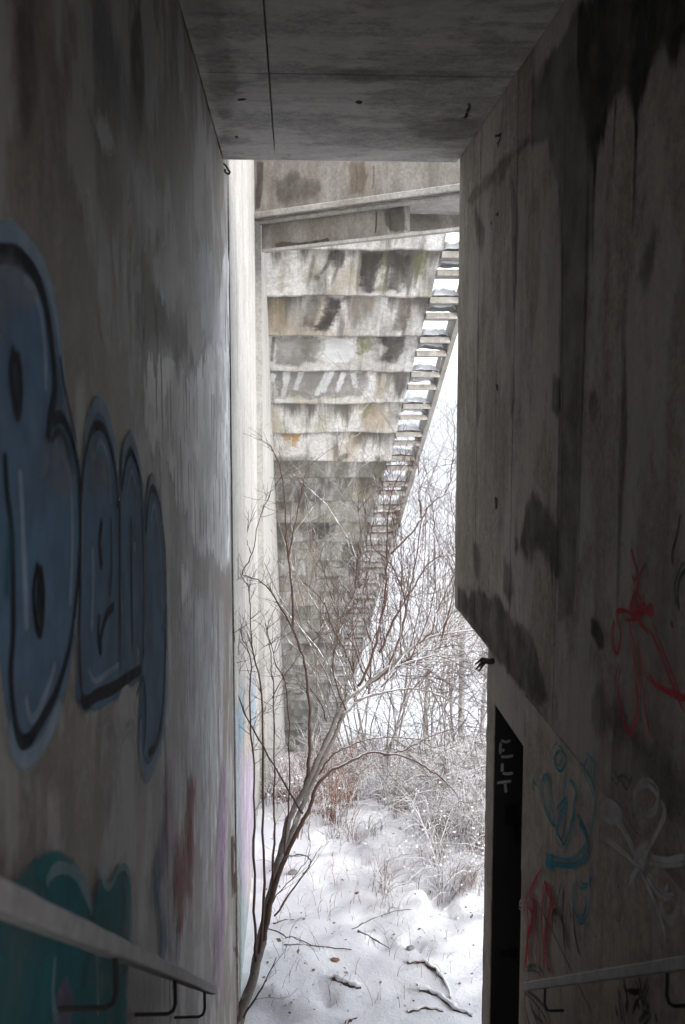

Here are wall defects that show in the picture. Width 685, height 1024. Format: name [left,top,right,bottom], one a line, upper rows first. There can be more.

damp [567,0,685,197]
damp [270,298,367,399]
damp [316,251,345,279]
damp [360,251,421,392]
damp [458,588,545,702]